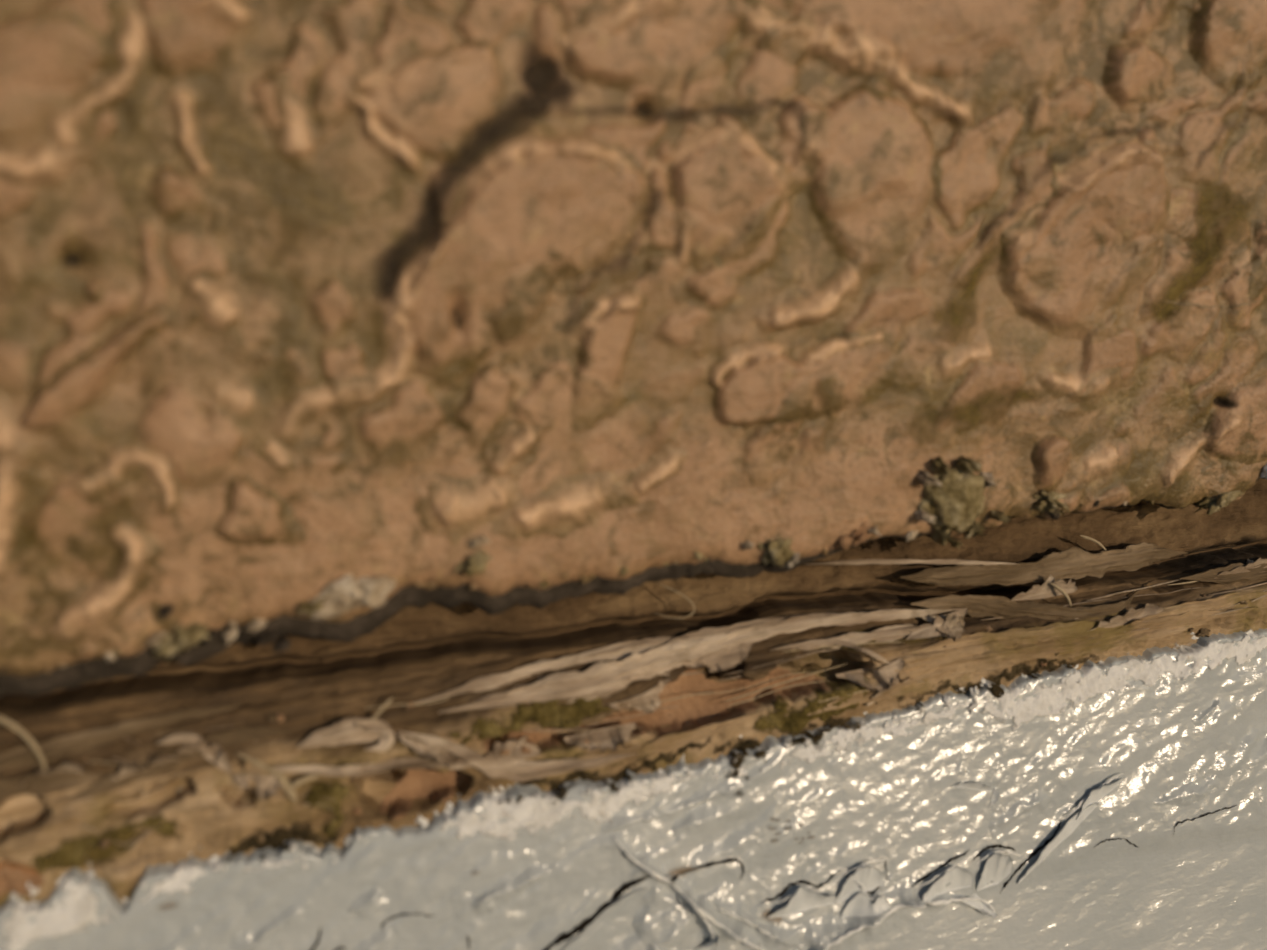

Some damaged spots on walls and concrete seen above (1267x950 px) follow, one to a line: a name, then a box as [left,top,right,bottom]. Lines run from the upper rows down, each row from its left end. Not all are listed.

crack [1173,805,1239,836]
crack [543,858,744,950]